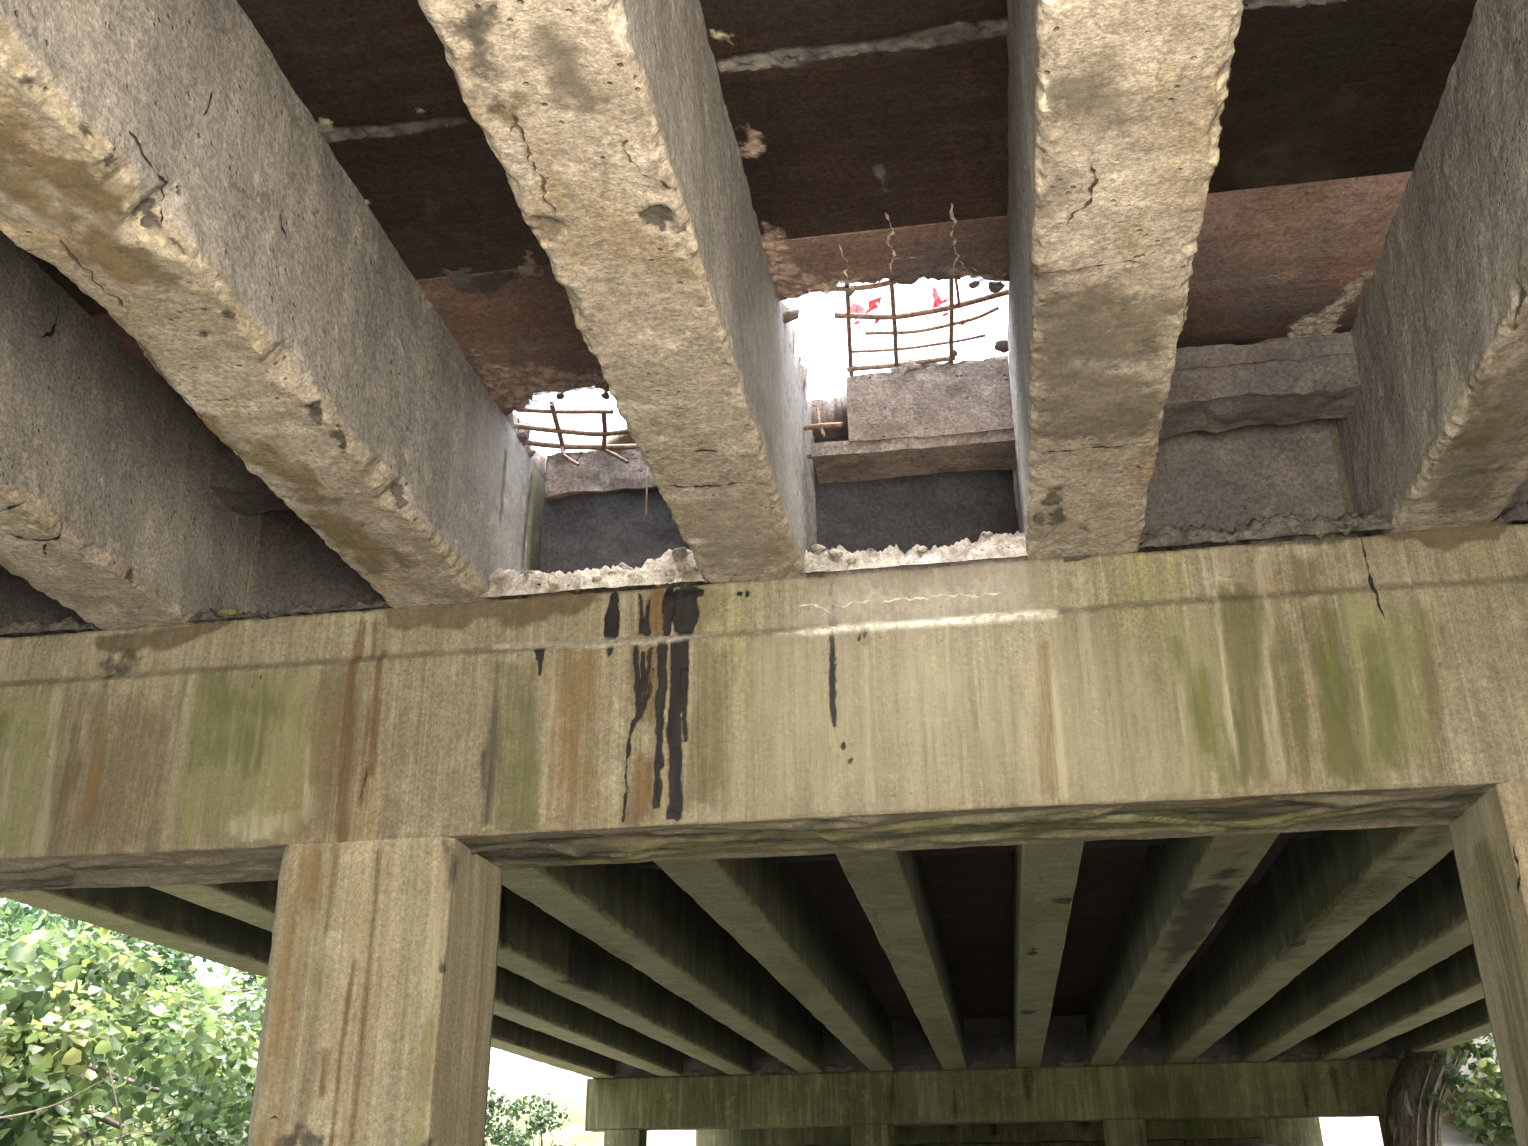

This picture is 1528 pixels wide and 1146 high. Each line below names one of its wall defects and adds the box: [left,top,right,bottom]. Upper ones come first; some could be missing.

crack [502,104,556,215]
spalling [743,130,765,158]
crack [1067,164,1099,225]
spalling [761,222,1009,377]
spalling [470,349,638,467]
spalling [803,405,843,438]
damp [387,591,620,656]
damp [622,585,704,822]
damp [828,582,838,727]
crack [1360,534,1385,618]
damp [482,711,497,823]